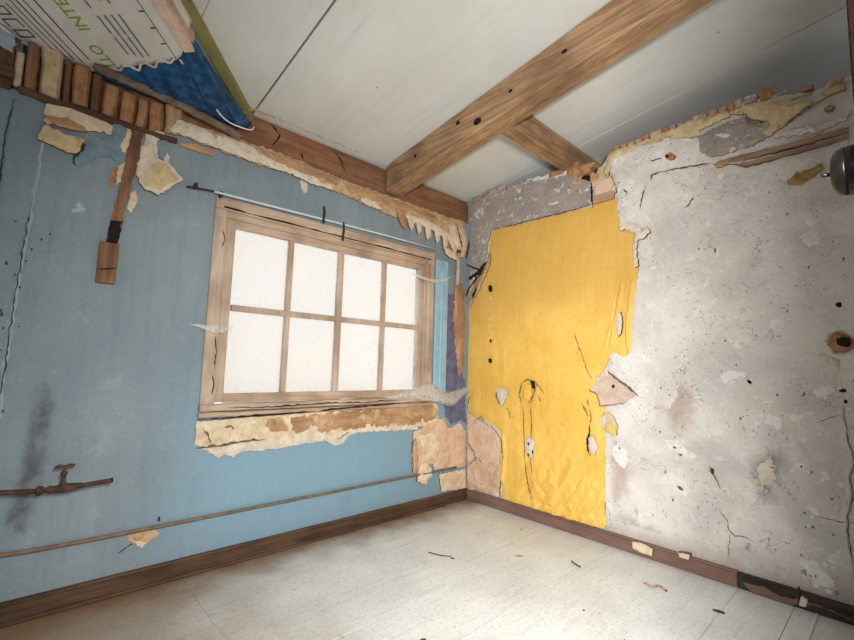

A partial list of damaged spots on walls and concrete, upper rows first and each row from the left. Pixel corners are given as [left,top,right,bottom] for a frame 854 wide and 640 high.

flaking render [38,103,131,187]
flaking render [127,120,464,249]
flaking render [592,176,617,196]
flaking render [608,80,846,155]
flaking render [194,394,503,497]
crack [816,405,854,580]